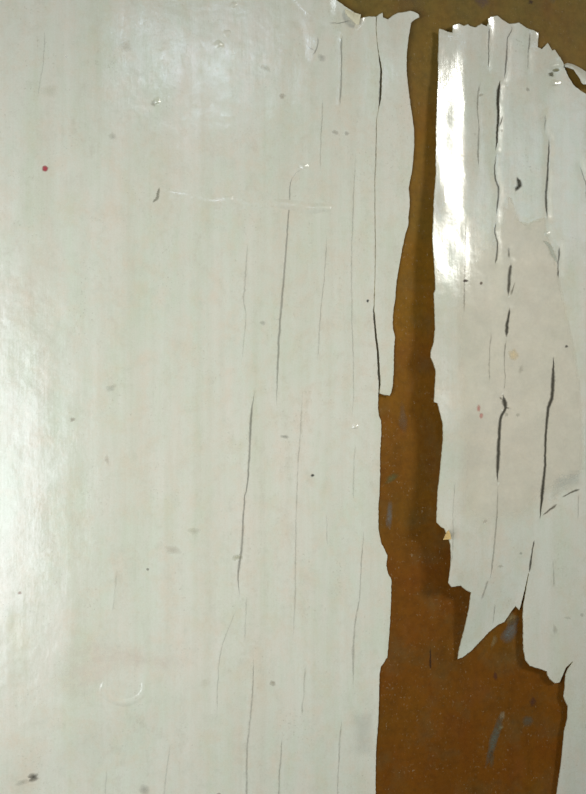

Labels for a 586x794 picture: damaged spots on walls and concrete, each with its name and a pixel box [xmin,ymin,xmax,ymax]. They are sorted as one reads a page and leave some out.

crack [488,37,513,335]
peeling [337,0,586,794]
crack [497,397,507,479]
crack [540,360,577,516]